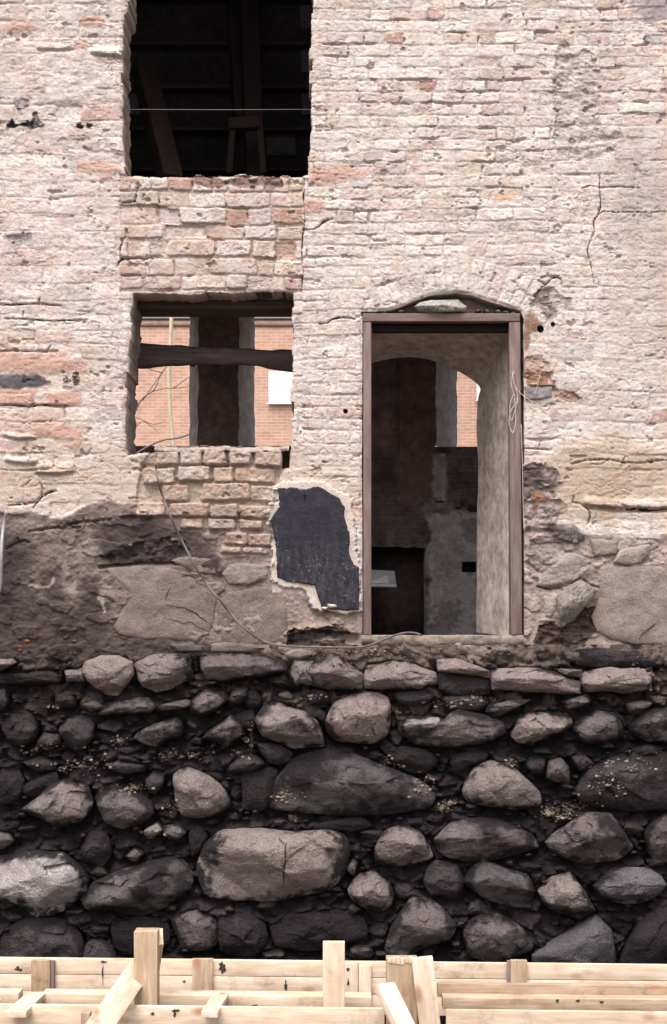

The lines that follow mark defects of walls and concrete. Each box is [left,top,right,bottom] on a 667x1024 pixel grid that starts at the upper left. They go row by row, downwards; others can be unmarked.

crack [582,178,661,282]
spalling [528,285,572,321]
spalling [523,355,583,401]
spalling [521,454,583,578]
damp [0,569,60,604]
flaking render [99,538,187,566]
damp [200,557,220,577]
peeling [262,453,494,649]
flaking render [533,605,597,645]